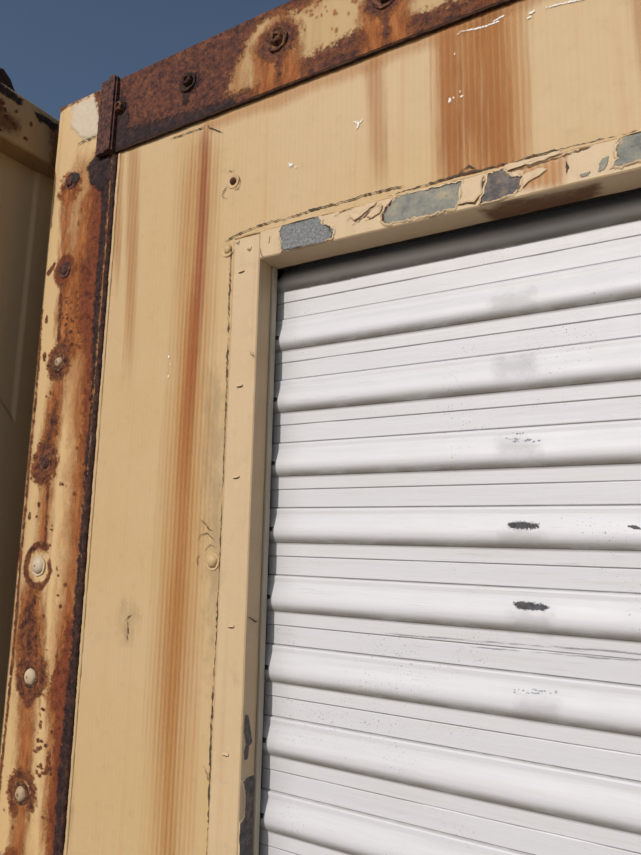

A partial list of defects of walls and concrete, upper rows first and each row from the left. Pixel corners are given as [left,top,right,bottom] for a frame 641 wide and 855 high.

corrosion [0,82,23,131]
corrosion [30,112,59,170]
corrosion [60,90,101,115]
peeling [71,95,99,148]
corrosion [115,0,525,177]
peeling [580,131,641,177]
peeling [278,144,593,253]
corrosion [163,149,207,730]
corrosion [0,154,112,855]
peeling [244,715,252,760]
peeling [238,772,255,855]